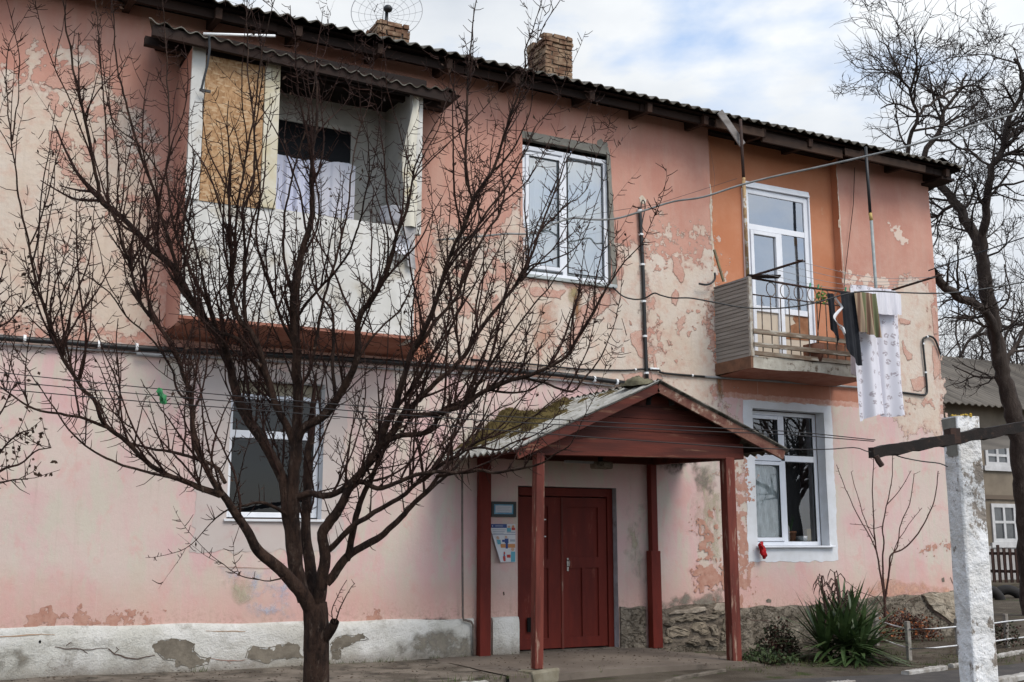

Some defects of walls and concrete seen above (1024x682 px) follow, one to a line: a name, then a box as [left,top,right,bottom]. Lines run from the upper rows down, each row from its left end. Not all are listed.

peeling [0,38,173,356]
peeling [424,185,739,421]
peeling [893,273,958,456]
peeling [689,507,724,601]
peeling [23,603,155,627]
crack [0,634,155,660]
spalling [152,638,211,669]
spalling [245,642,304,664]
spalling [330,633,369,660]